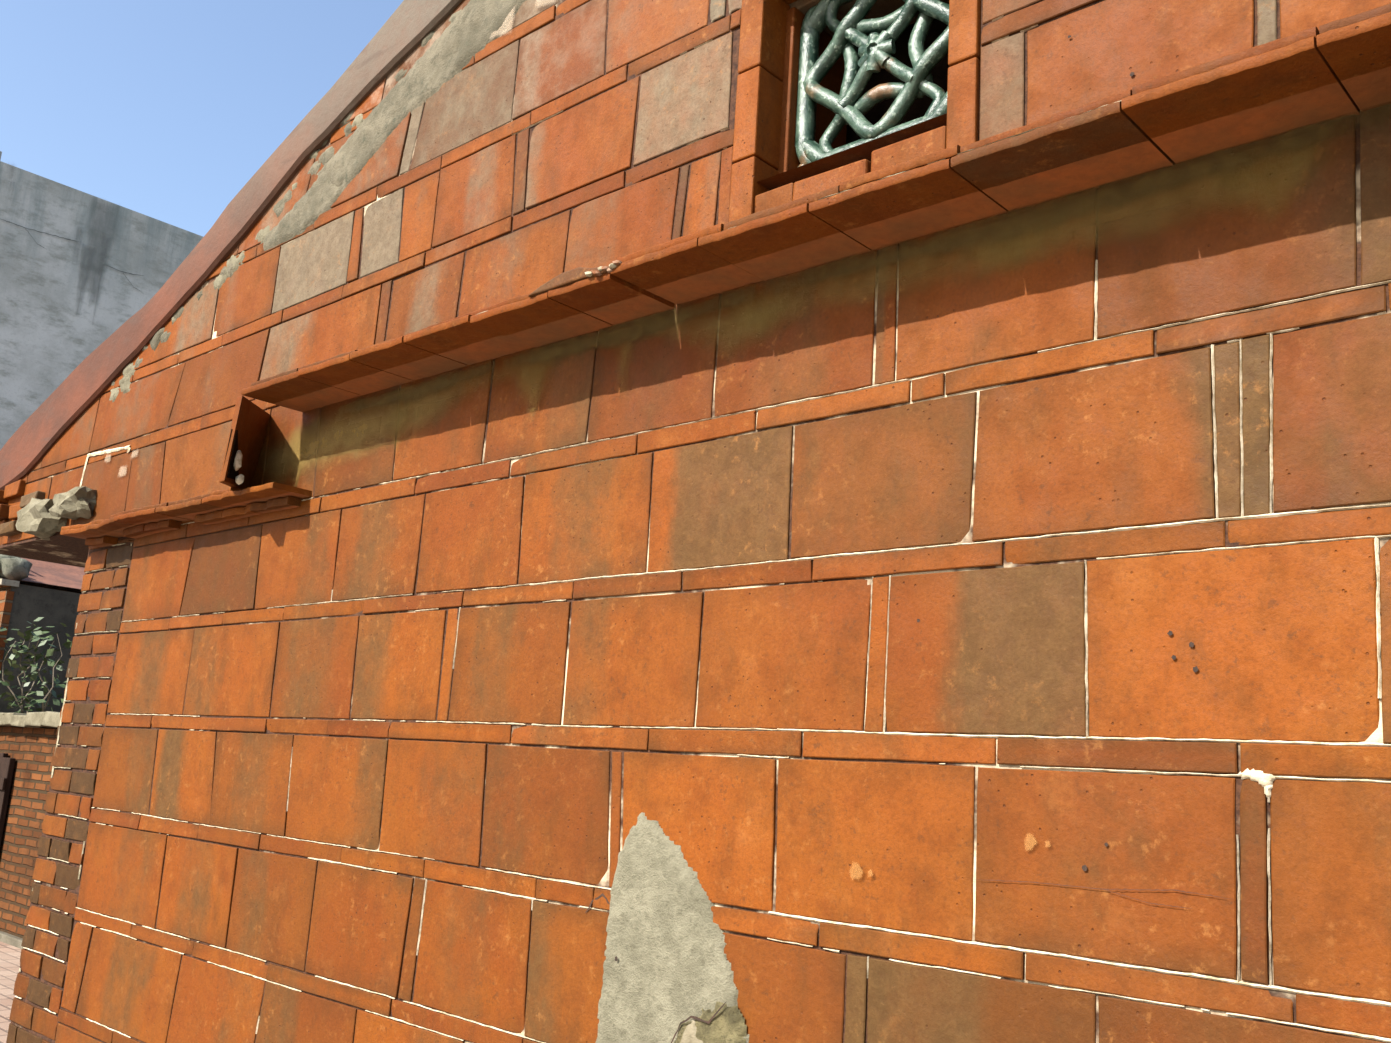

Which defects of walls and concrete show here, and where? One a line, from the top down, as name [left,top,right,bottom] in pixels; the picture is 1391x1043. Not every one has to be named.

peeling [109,0,526,402]
spalling [528,260,622,297]
spalling [674,1001,747,1043]